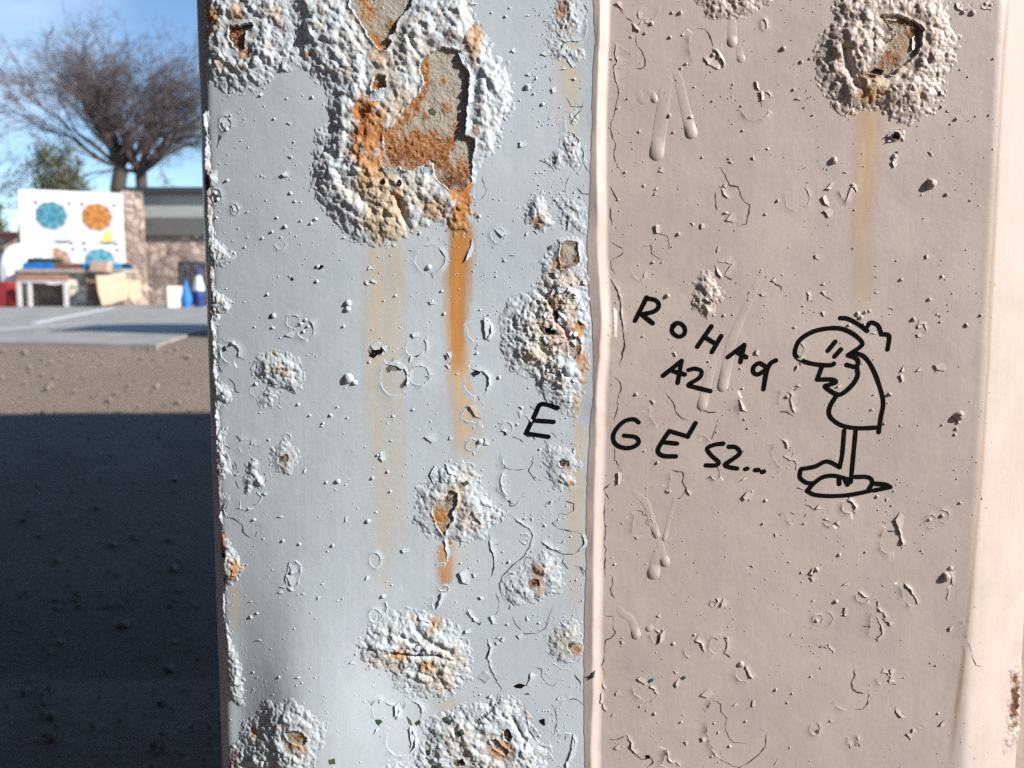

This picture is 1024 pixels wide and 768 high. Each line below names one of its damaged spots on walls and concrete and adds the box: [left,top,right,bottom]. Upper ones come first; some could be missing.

corrosion [448,228,471,444]
peeling [483,221,518,256]
crack [476,433,654,768]